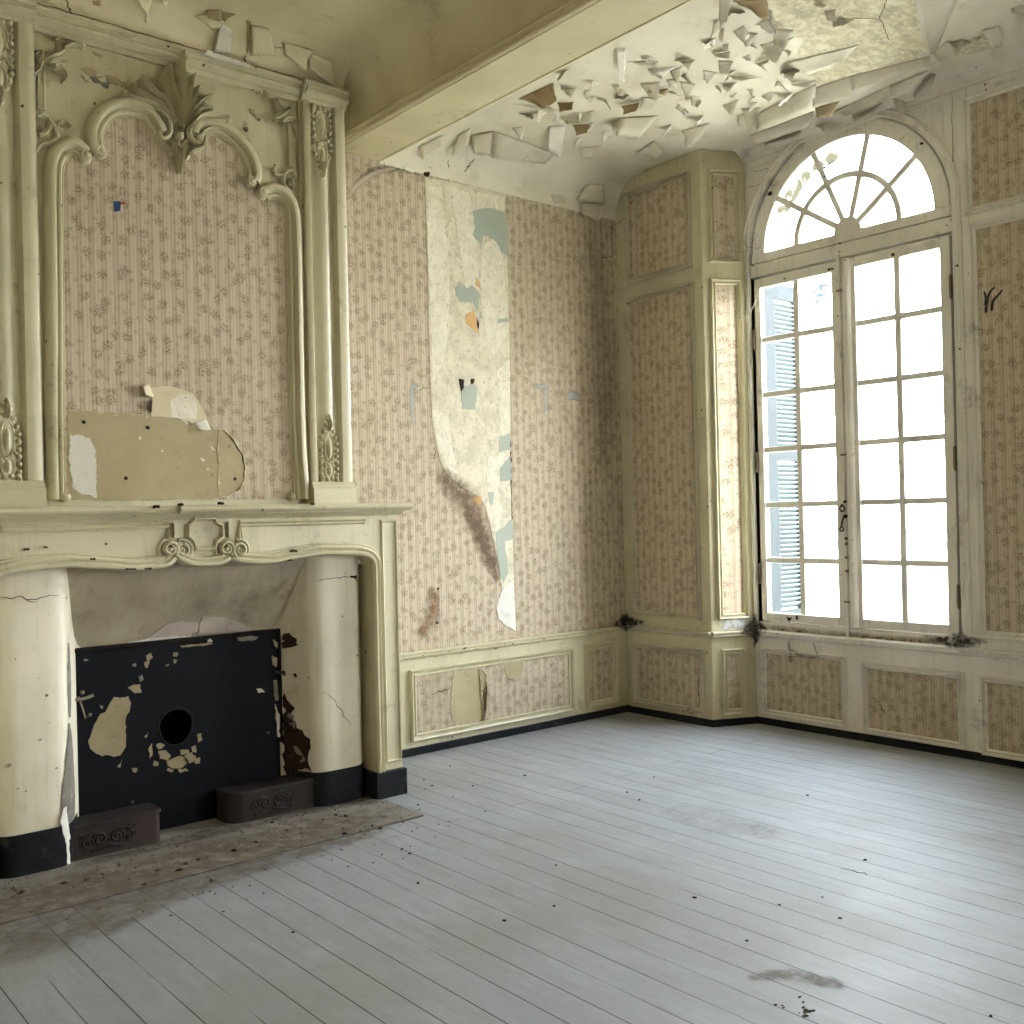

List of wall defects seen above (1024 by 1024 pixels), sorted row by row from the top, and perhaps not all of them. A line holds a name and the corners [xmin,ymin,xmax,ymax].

crack [832,0,889,40]
flaking render [383,0,1002,590]
flaking render [67,410,244,508]
damp [442,472,499,581]
crack [0,594,58,602]
peeling [88,615,262,773]
spalling [60,643,104,864]